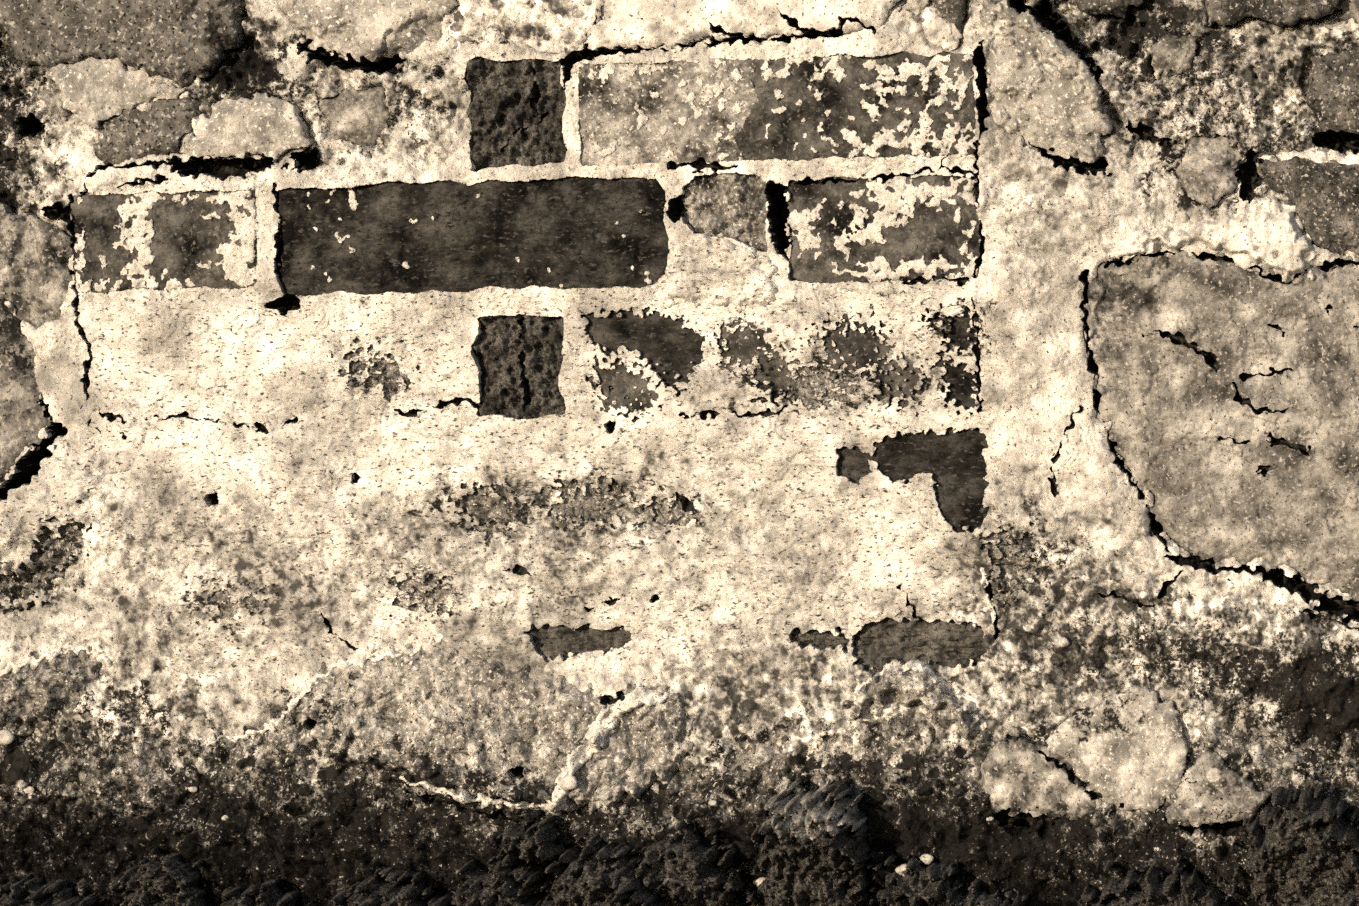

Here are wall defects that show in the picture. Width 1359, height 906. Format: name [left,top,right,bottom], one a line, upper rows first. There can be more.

peeling [589,140,618,161]
peeling [588,63,668,84]
peeling [634,58,745,161]
peeling [760,53,976,159]
peeling [73,190,258,293]
peeling [307,188,359,253]
peeling [764,176,978,283]
flaking render [582,299,1057,616]
crack [1048,250,1359,608]
flaking render [526,623,632,662]
flaking render [791,617,989,674]
crack [1299,608,1359,630]